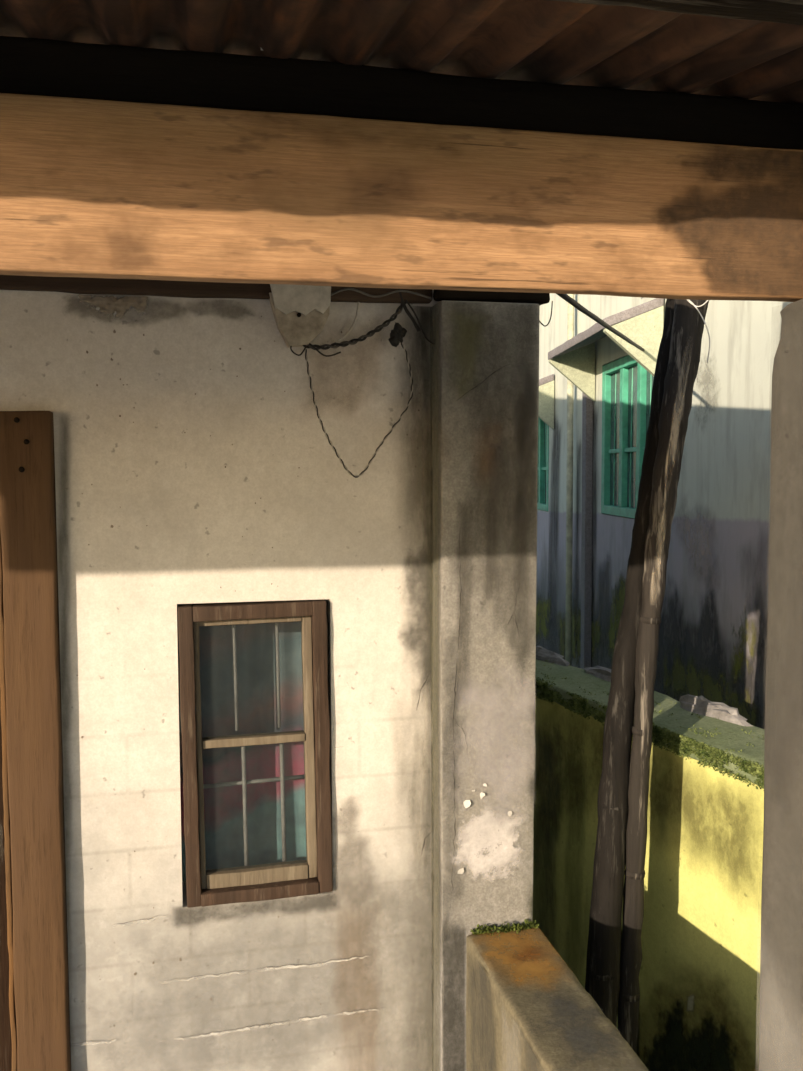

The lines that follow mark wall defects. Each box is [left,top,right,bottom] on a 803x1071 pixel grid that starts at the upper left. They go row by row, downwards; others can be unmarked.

damp [660,149,803,296]
damp [407,312,433,689]
peeling [458,783,519,876]
damp [176,908,226,924]
damp [236,895,335,911]
crack [217,956,367,977]
corrosion [485,928,560,984]
crack [160,1008,377,1042]